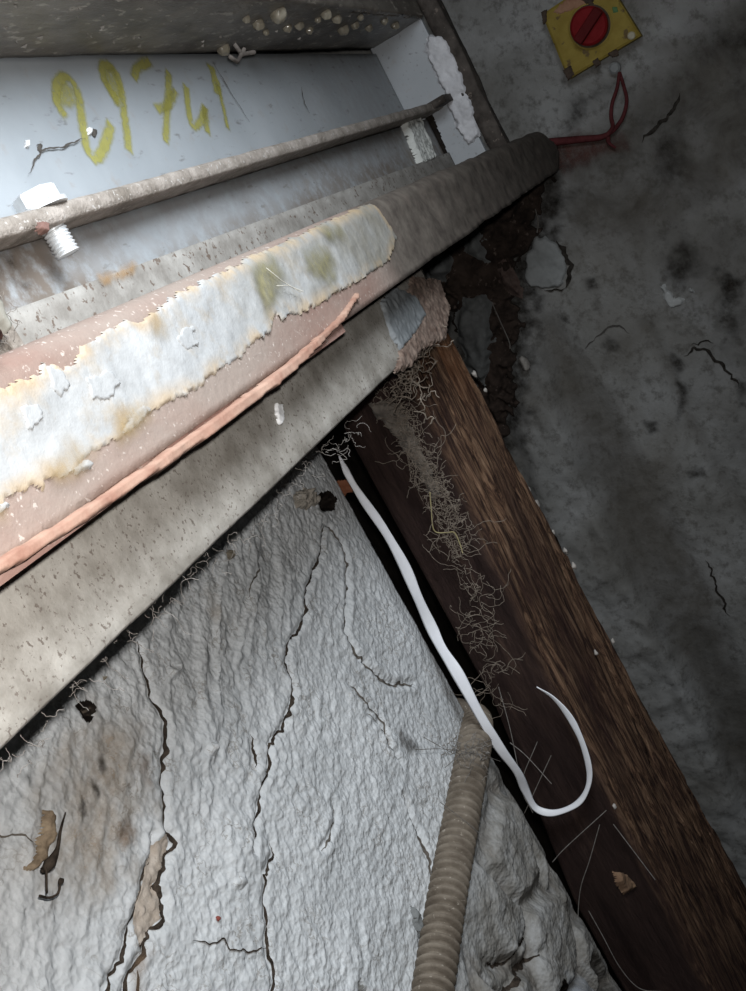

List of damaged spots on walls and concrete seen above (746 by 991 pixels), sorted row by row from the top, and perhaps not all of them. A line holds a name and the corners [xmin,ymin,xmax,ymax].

peeling [524,235,574,292]
peeling [0,204,397,513]
crack [686,340,739,386]
corrosion [337,480,353,497]
crack [706,561,727,614]
crack [193,524,412,991]
crack [105,641,178,991]
crack [412,823,432,875]
spalling [133,834,168,947]
crack [484,936,540,991]